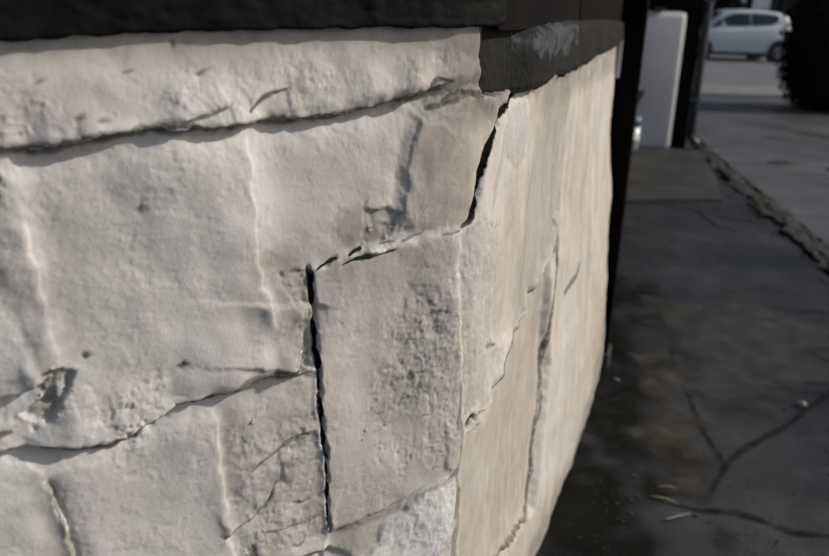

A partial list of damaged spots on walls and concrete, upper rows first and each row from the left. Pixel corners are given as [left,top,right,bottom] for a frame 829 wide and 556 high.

crack [1,77,515,236]
crack [0,430,12,438]
crack [47,484,75,556]
crack [41,414,166,450]
crack [188,232,421,556]
crack [448,386,463,556]
crack [669,343,829,536]